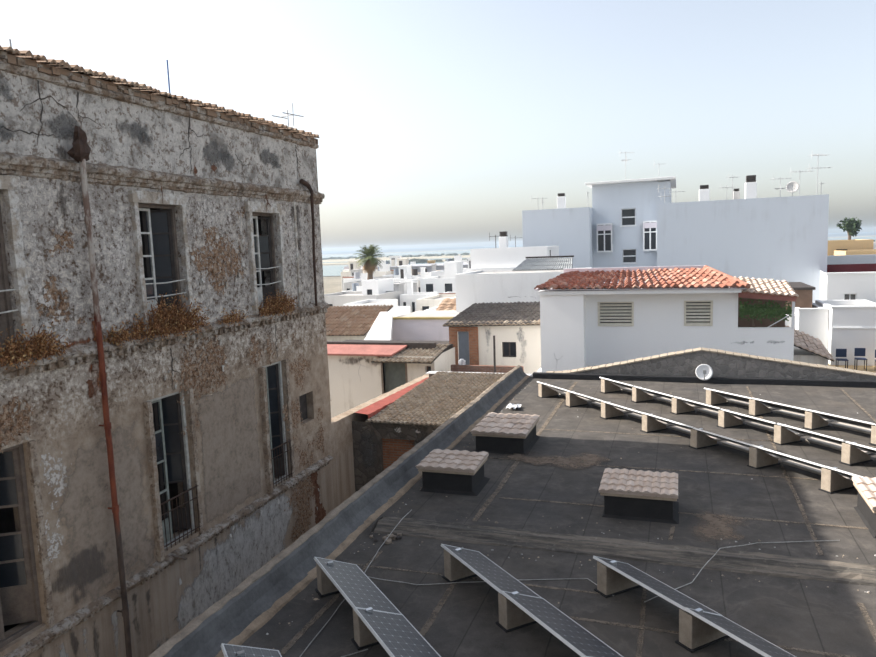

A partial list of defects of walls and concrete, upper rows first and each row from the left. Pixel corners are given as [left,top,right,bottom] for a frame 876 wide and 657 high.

crack [4,80,103,140]
crack [179,117,205,174]
spalling [182,197,250,295]
peeling [283,208,312,292]
spalling [157,335,228,436]
spalling [246,329,311,391]
peeling [177,400,326,629]